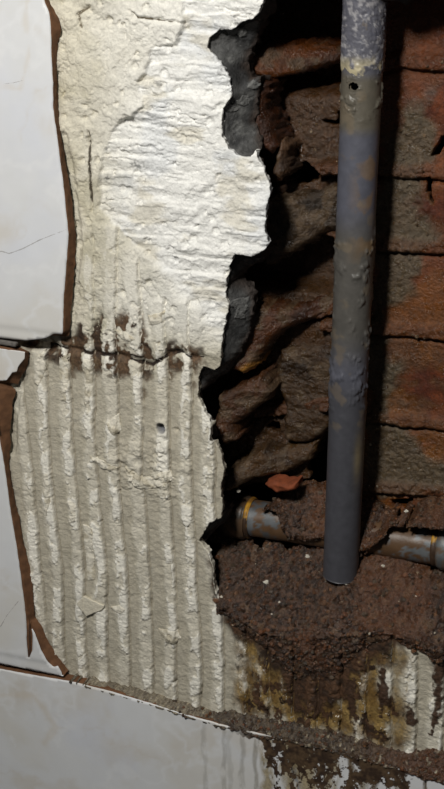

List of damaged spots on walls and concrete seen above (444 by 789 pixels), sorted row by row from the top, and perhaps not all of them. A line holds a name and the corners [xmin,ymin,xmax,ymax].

spalling [222,20,260,65]
spalling [224,72,261,144]
peeling [34,348,47,386]
peeling [59,353,71,401]
peeling [82,359,94,415]
crack [60,345,204,366]
spalling [201,296,250,380]
peeling [89,455,174,489]
peeling [67,501,95,580]
water stain [236,639,407,747]
water stain [244,732,444,789]